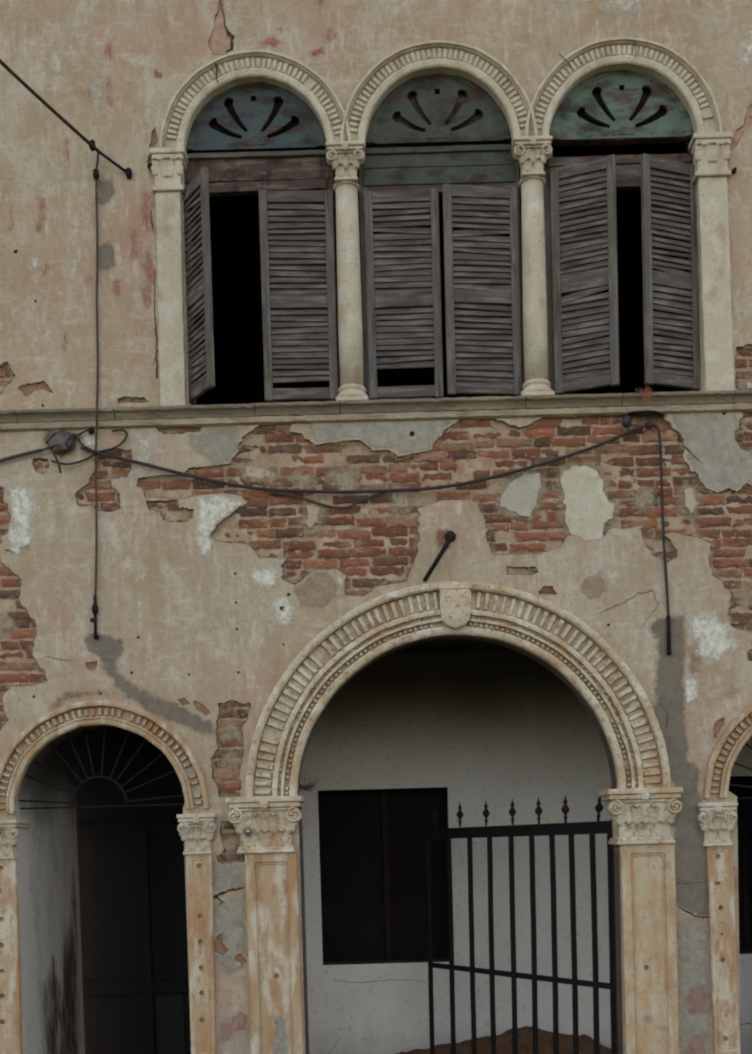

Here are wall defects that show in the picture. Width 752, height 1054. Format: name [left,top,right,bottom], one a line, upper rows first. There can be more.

flaking render [0,361,53,397]
flaking render [735,344,752,389]
flaking render [0,487,11,544]
flaking render [75,412,752,632]
crack [600,590,659,628]
flaking render [0,559,47,730]
flaking render [178,697,251,798]
crack [213,887,244,905]
water stain [45,898,78,1054]
flaking render [214,933,247,965]